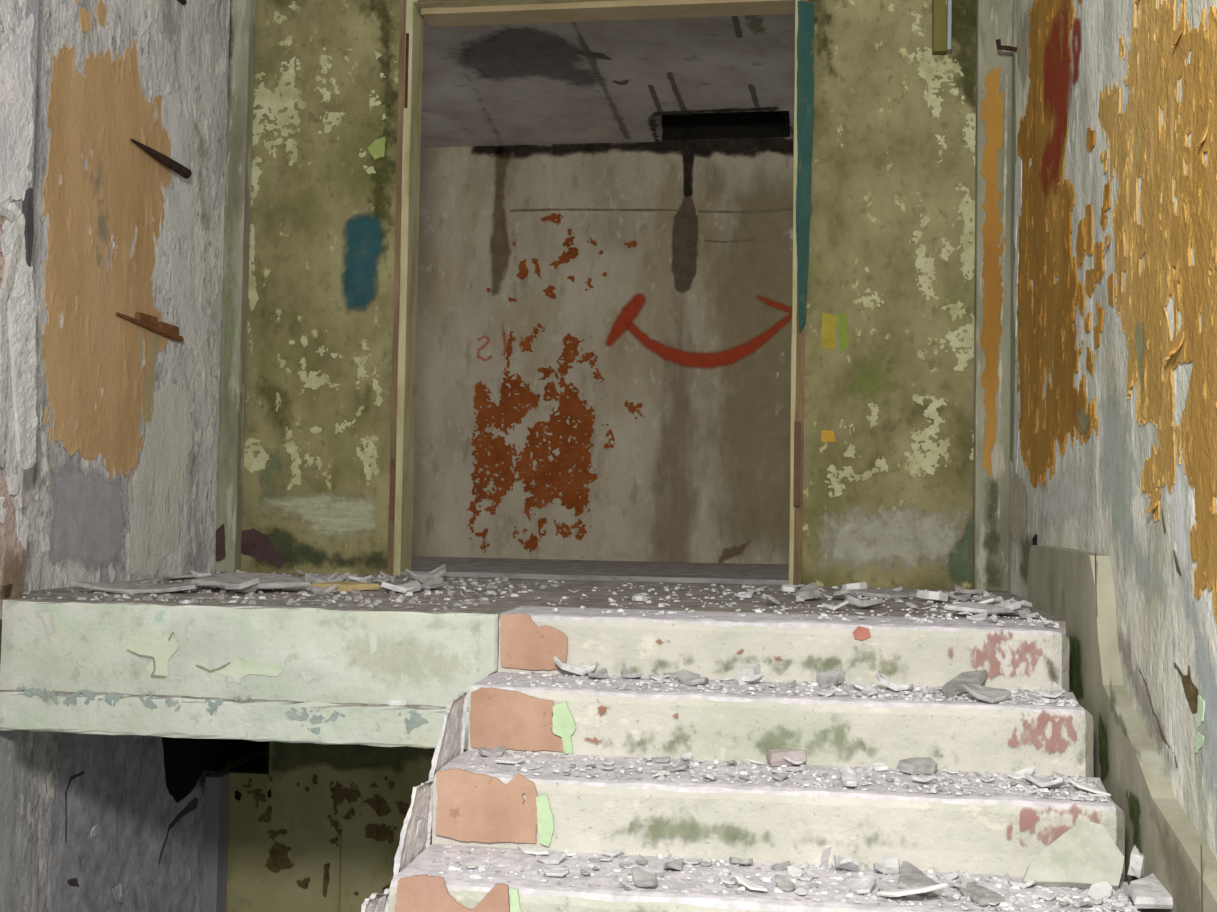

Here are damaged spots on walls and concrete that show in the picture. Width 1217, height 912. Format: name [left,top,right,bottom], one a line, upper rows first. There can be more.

peeling [251,4,352,206]
peeling [0,14,259,600]
water stain [488,119,510,295]
peeling [516,213,607,299]
water stain [672,139,698,292]
peeling [908,0,1217,623]
peeling [276,336,383,490]
peeling [466,324,615,553]
peeling [824,394,950,497]
flaking render [288,564,446,595]
peeling [972,629,1043,678]
peeling [296,613,670,912]